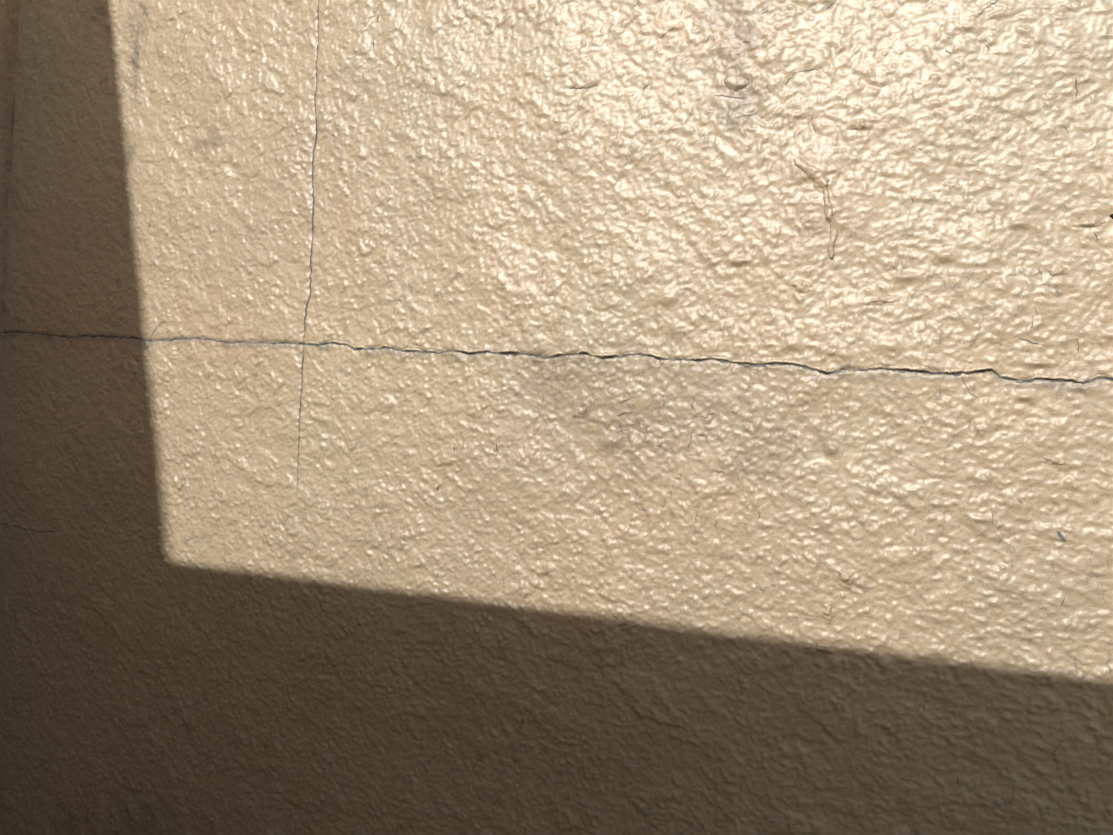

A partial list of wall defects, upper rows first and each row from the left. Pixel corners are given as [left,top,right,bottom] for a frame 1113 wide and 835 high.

crack [0,0,1113,486]